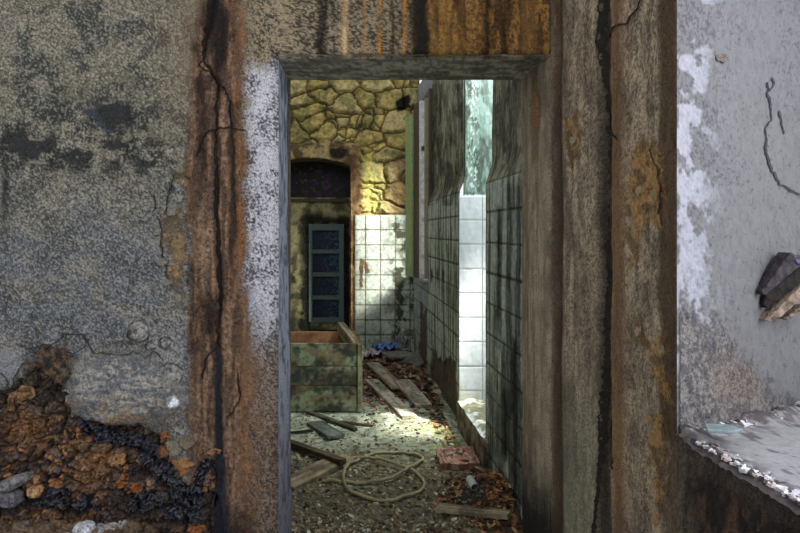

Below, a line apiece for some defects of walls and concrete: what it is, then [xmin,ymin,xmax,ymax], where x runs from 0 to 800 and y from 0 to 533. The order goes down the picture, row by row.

corrosion [426,0,562,57]
leakage [0,132,93,211]
leakage [83,98,164,170]
crack [196,0,247,379]
corrosion [186,0,258,533]
corrosion [554,70,562,442]
crack [591,0,641,533]
crack [649,149,661,214]
corrosion [659,0,674,440]
crack [765,77,800,195]
spalling [0,367,222,533]
crack [227,372,241,417]